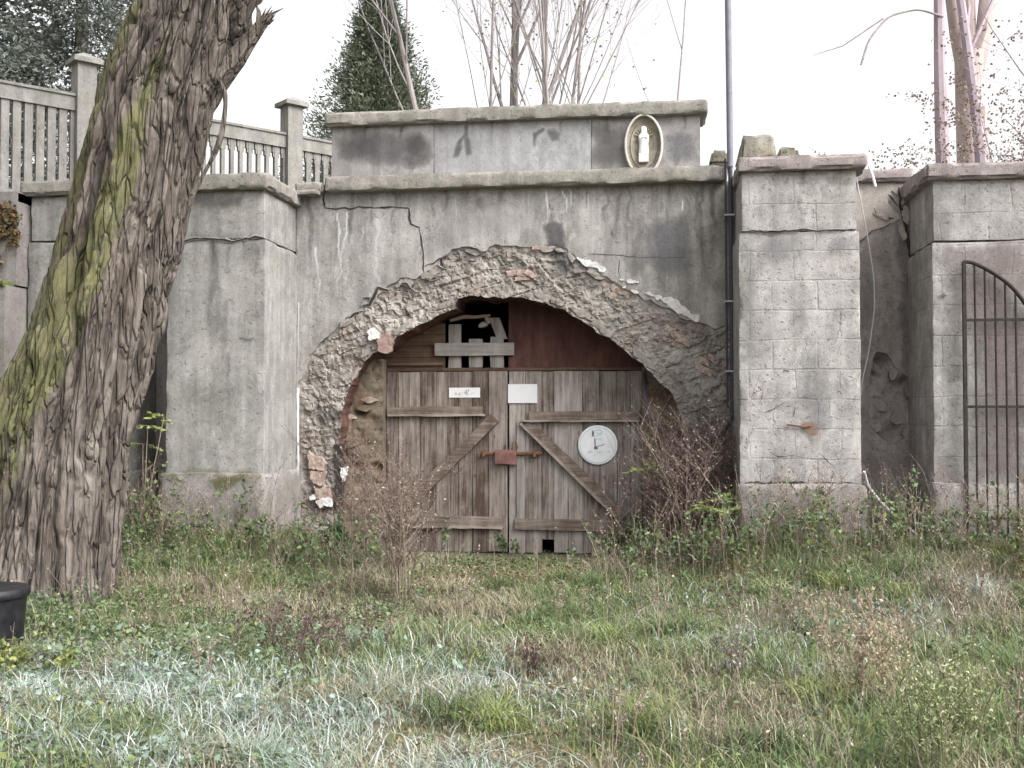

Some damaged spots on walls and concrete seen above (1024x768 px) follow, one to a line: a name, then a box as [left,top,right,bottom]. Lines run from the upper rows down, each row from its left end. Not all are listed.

crack [184,235,264,255]
crack [322,194,477,331]
crack [740,227,855,235]
peeling [855,183,910,241]
spalling [298,245,733,546]
corrosion [788,422,818,434]